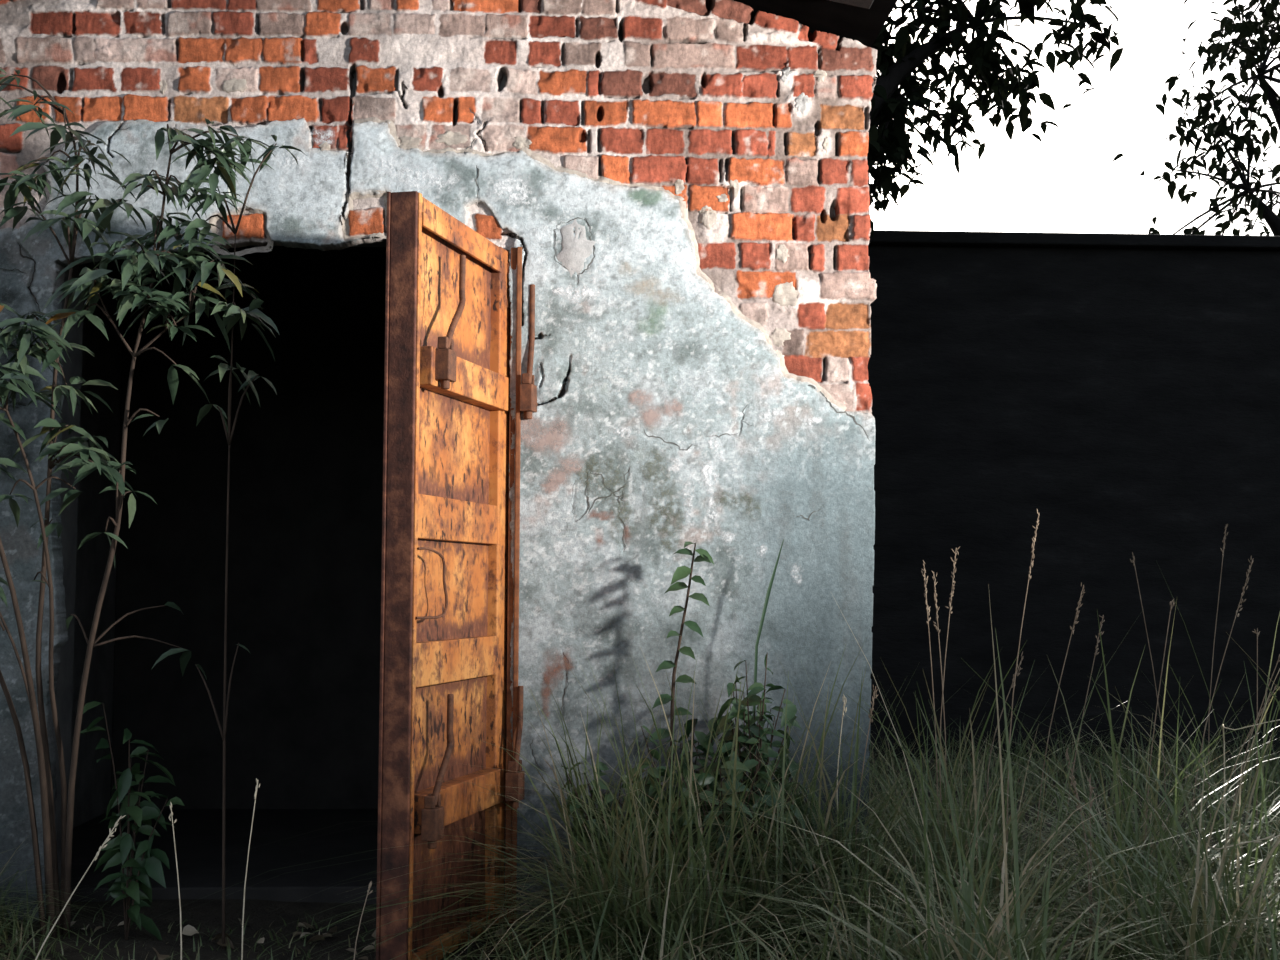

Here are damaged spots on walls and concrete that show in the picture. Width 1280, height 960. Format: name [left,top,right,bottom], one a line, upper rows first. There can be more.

spalling [781,67,793,83]
spalling [813,69,827,82]
spalling [795,92,810,115]
crack [339,100,354,225]
spalling [209,208,273,256]
spalling [342,190,387,241]
spalling [354,117,847,411]
crack [644,404,752,450]
crack [571,466,630,552]